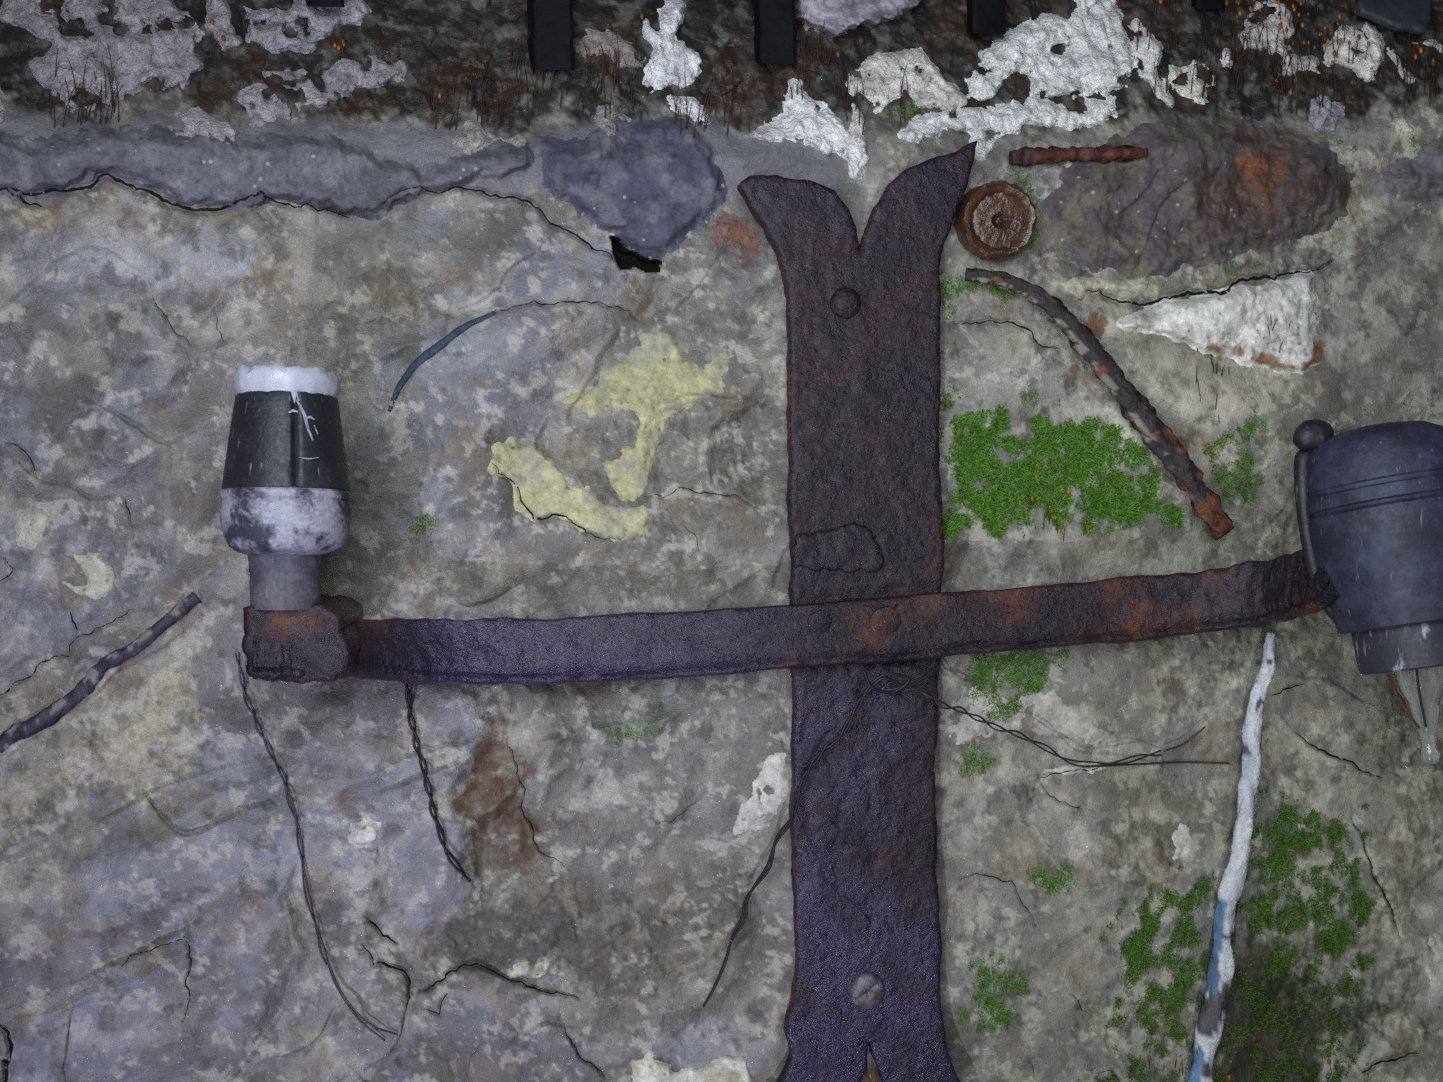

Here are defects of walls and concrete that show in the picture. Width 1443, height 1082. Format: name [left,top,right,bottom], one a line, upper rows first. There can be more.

crack [0,173,347,217]
crack [384,186,657,266]
corrosion [713,214,761,268]
crack [488,300,637,320]
corrosion [965,268,1234,540]
crack [507,737,572,872]
crack [123,939,192,1021]
crack [362,919,580,1015]
crack [0,1025,13,1082]
crack [566,1034,604,1076]
crack [1364,1052,1419,1072]